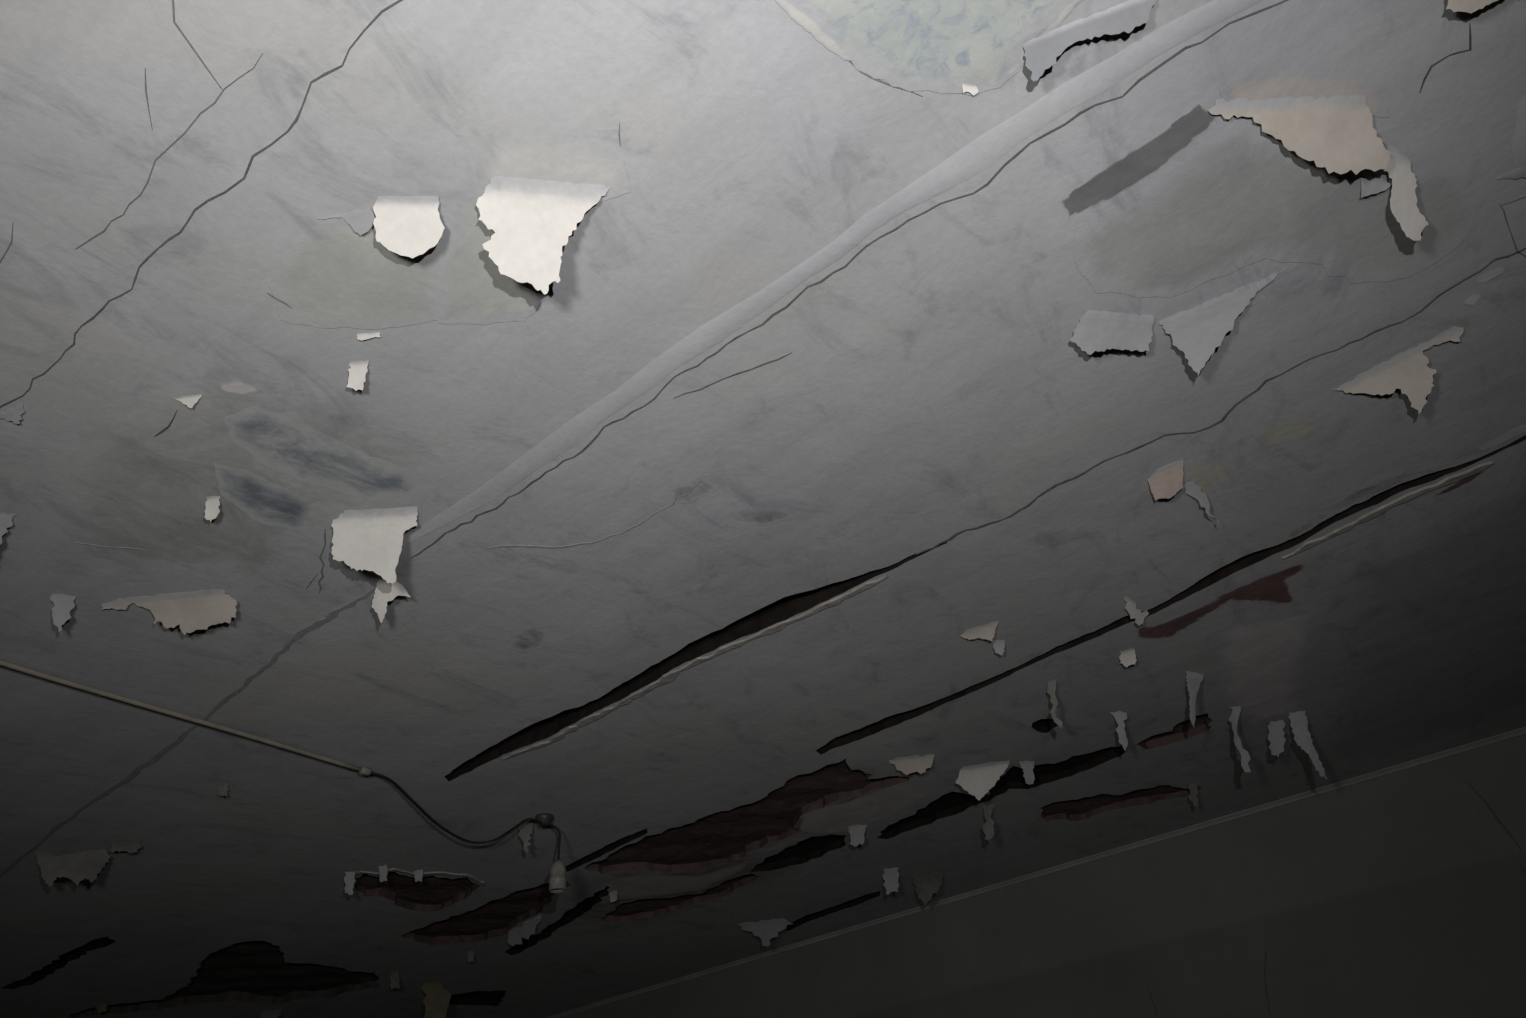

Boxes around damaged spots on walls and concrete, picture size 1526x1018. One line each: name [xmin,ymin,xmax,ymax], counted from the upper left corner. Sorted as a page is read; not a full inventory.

peeling [775,0,1156,96]
peeling [1446,0,1498,13]
crack [0,0,402,408]
peeling [268,134,631,341]
peeling [1070,71,1489,376]
peeling [347,360,369,391]
peeling [1332,326,1464,415]
crack [154,411,177,437]
peeling [0,513,17,545]
peeling [101,589,238,635]
peeling [331,435,1526,962]